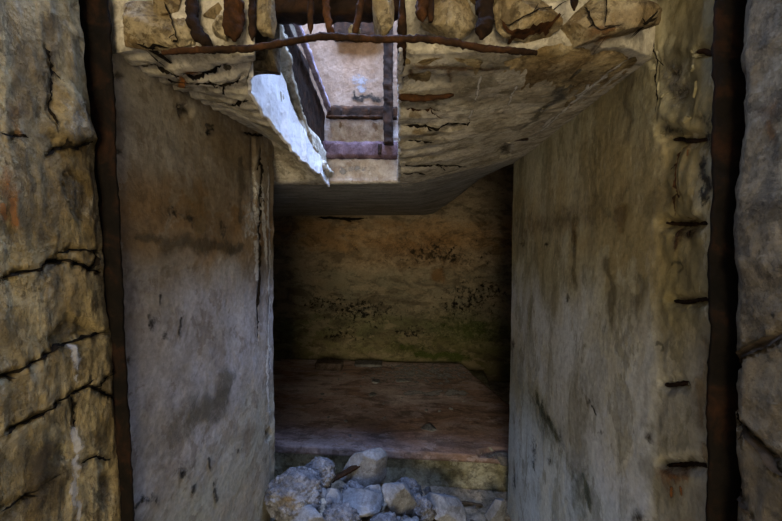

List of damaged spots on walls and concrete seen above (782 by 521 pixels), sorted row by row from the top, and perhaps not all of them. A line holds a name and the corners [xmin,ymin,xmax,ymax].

crack [45,48,93,156]
spalling [161,0,538,181]
crack [405,107,470,144]
crack [403,164,462,175]
crack [0,248,105,281]
crack [1,332,105,379]
crack [4,372,115,436]